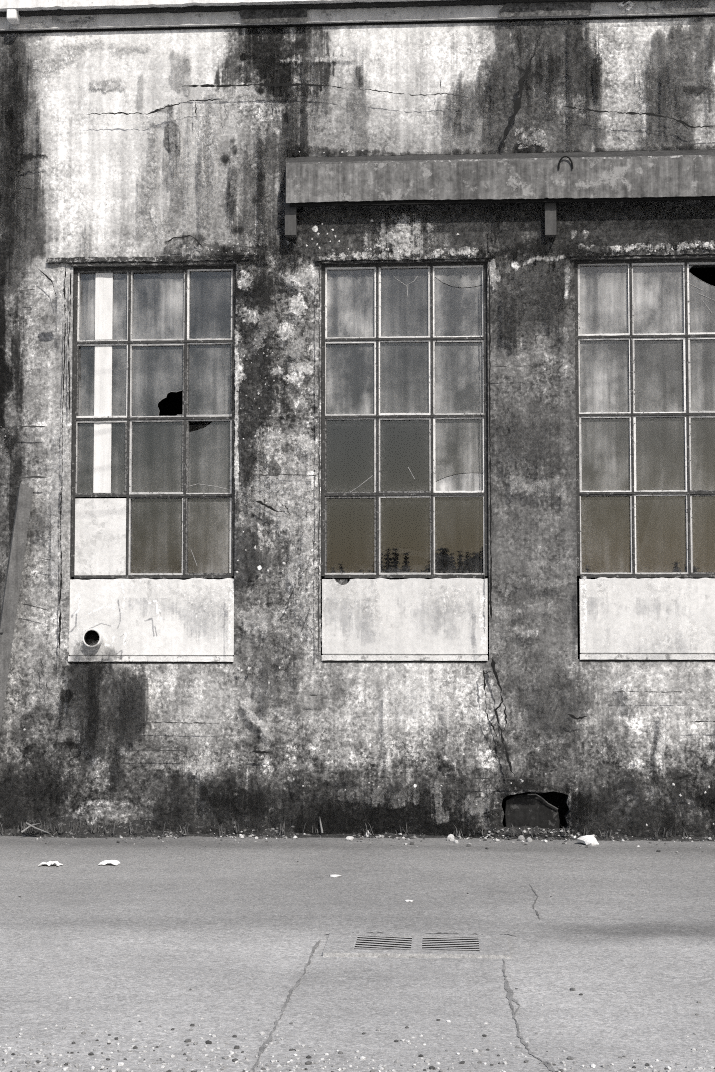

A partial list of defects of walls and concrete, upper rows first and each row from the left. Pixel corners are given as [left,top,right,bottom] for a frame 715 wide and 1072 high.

crack [87,80,468,115]
crack [564,106,713,130]
damp [0,33,148,549]
damp [136,0,715,584]
damp [0,661,149,829]
damp [241,639,300,739]
peeling [338,787,419,808]
damp [142,689,715,838]
peeling [431,779,449,823]
crack [454,657,561,780]
spalling [462,785,575,828]
damp [619,677,635,700]